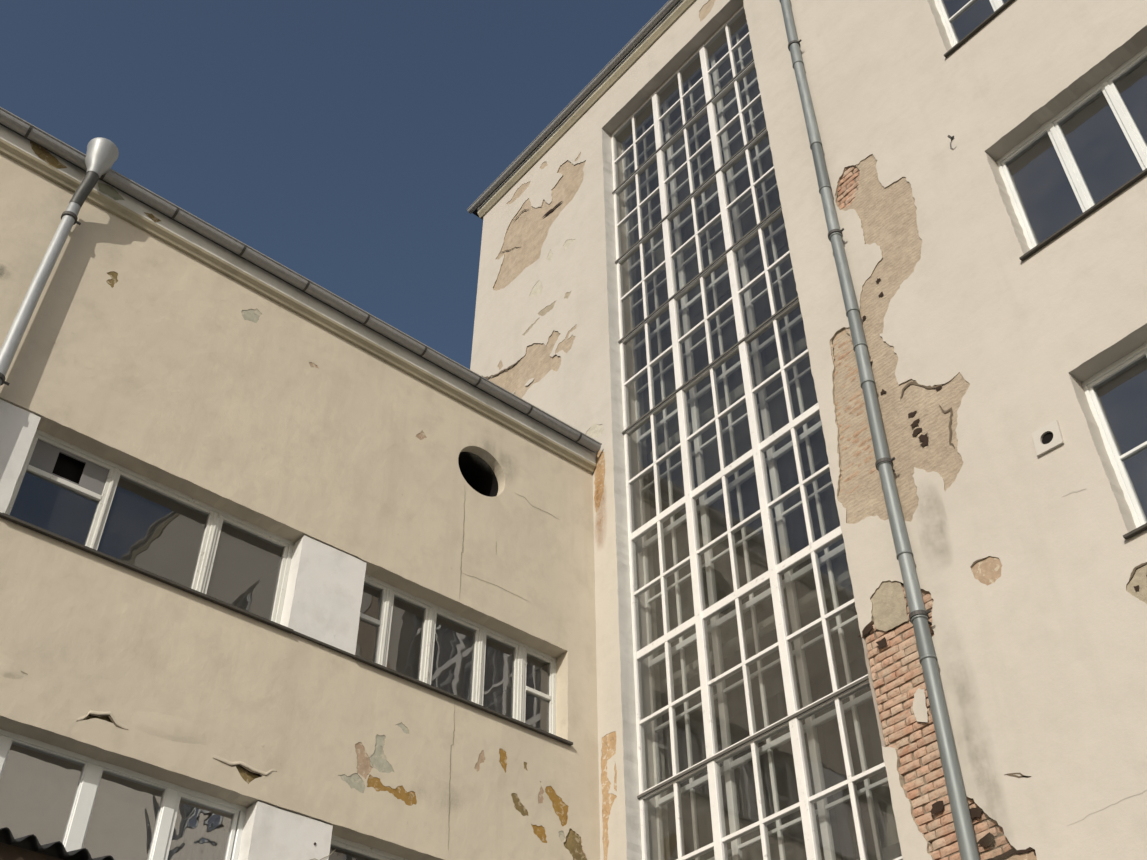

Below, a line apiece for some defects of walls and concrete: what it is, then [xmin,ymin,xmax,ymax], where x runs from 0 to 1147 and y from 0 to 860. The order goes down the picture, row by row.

flaking render [493,152,586,291]
flaking render [482,280,577,398]
flaking render [830,154,970,524]
flaking render [970,556,1002,586]
flaking render [1126,562,1147,604]
flaking render [859,580,961,860]
peeling [338,734,417,806]
peeling [475,750,485,772]
peeling [499,748,507,773]
peeling [511,781,587,860]
peeling [601,731,617,860]
flaking render [967,797,1037,860]